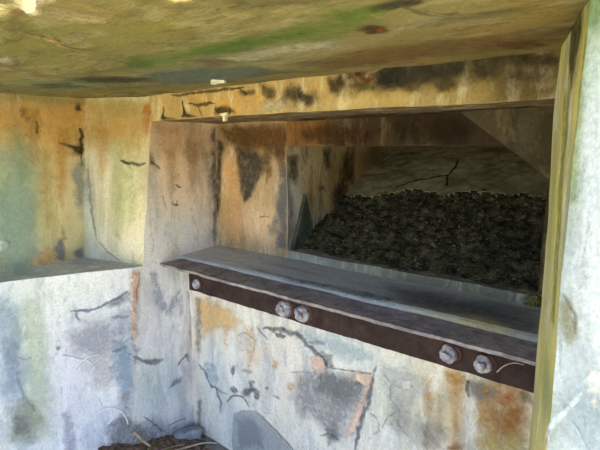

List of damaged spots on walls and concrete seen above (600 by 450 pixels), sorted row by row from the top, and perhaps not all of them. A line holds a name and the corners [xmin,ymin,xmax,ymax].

damp [263,87,313,110]
crack [59,128,103,246]
damp [211,125,297,248]
crack [395,160,459,187]
crack [70,291,128,321]
peeling [131,273,139,339]
rust [189,295,236,350]
crack [172,354,226,413]
crack [261,327,407,450]
spalling [298,356,372,441]